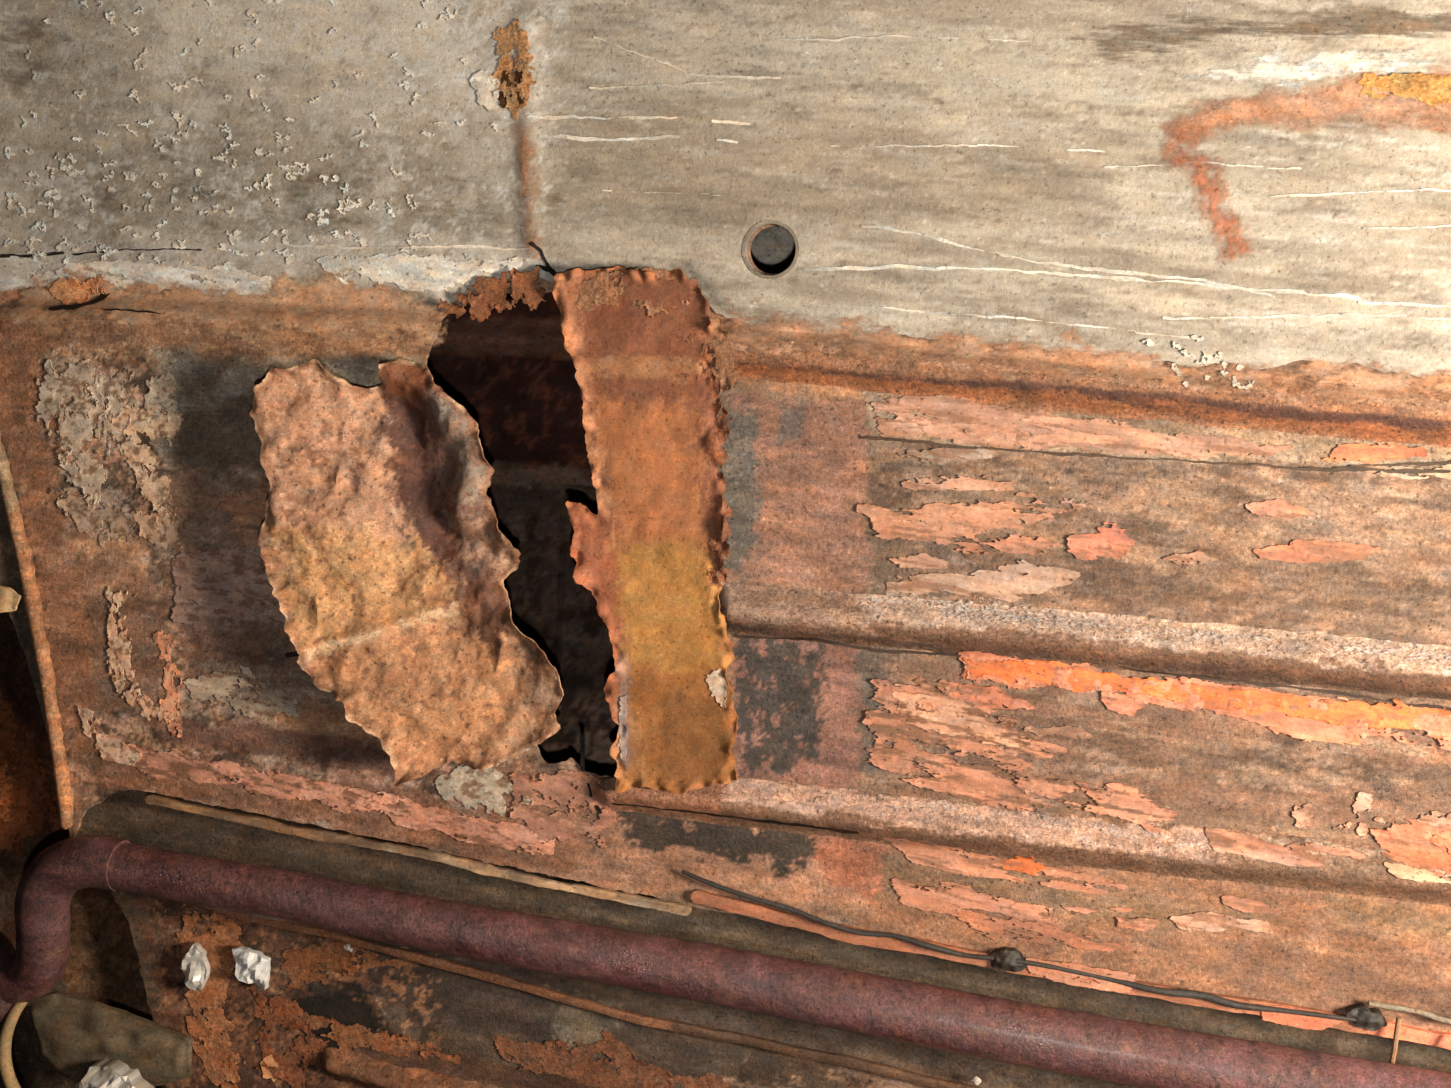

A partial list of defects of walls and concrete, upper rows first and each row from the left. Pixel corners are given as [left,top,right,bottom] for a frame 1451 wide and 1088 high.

corrosion [10,19,546,348]
peeling [317,253,522,293]
corrosion [574,266,696,319]
corrosion [1164,71,1451,259]
peeling [856,395,1294,602]
peeling [1323,443,1451,480]
corrosion [0,690,65,869]
peeling [35,359,617,855]
peeling [706,668,727,708]
peeling [862,651,1451,833]
peeling [1205,792,1451,883]
corrosion [176,911,461,1088]